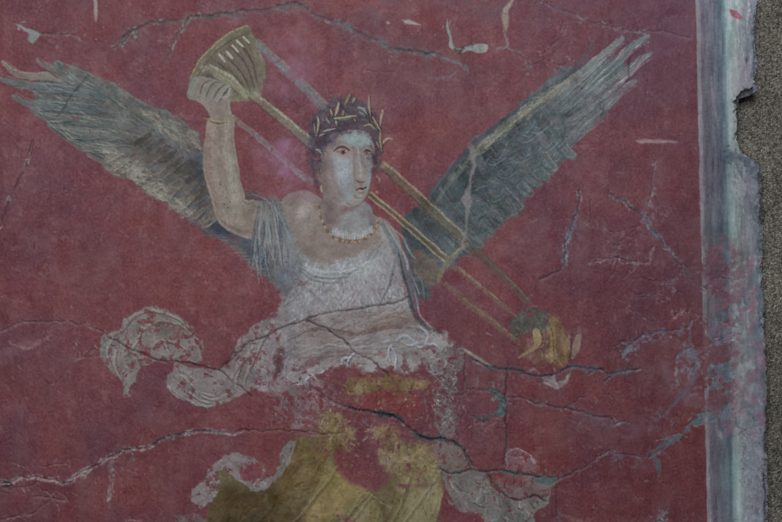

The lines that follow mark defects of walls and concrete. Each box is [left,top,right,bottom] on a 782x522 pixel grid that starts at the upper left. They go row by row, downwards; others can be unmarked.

crack [109,0,446,65]
peeling [402,18,422,26]
spalling [426,18,489,81]
spalling [730,85,756,119]
crack [0,137,39,233]
crack [0,293,411,399]
crack [289,158,745,522]